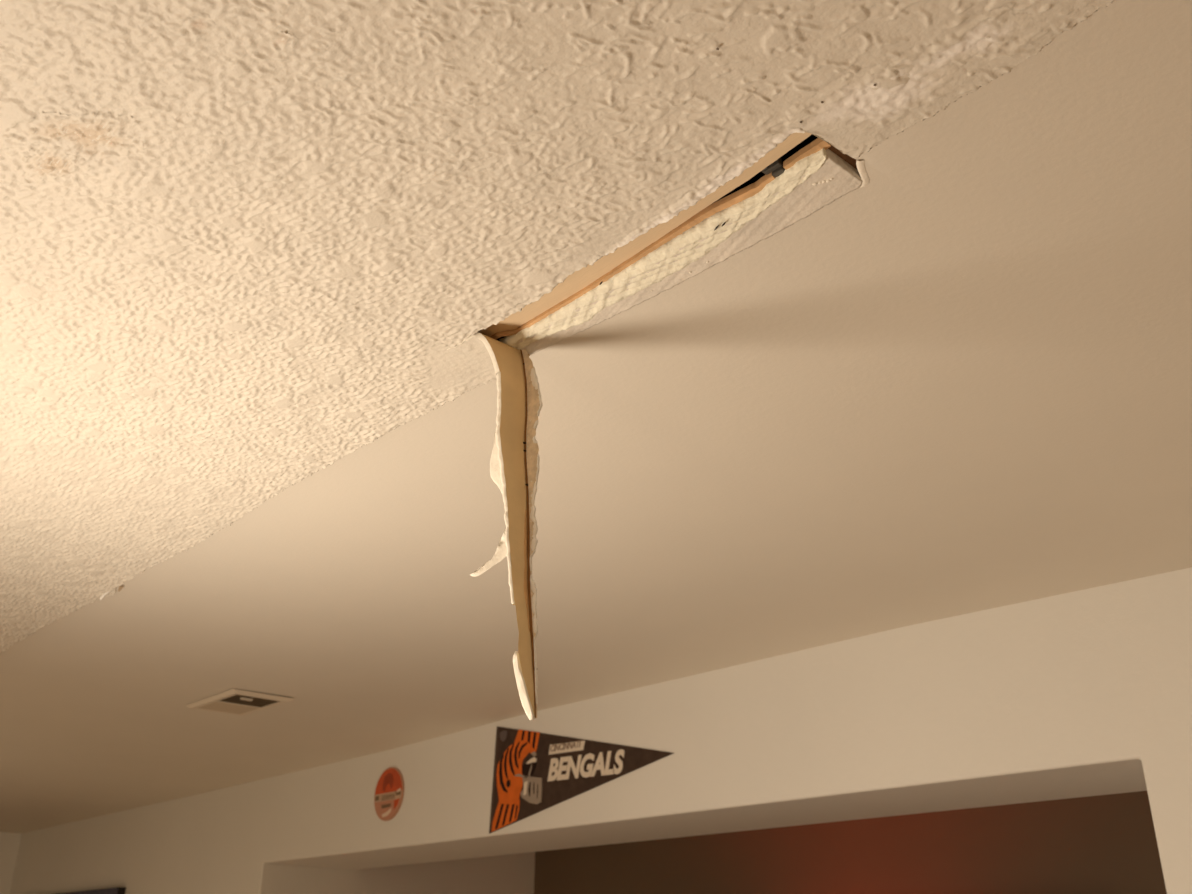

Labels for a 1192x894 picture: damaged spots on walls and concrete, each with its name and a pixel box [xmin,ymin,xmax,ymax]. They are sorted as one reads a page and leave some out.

peeling [490,432,503,493]
peeling [470,529,507,577]